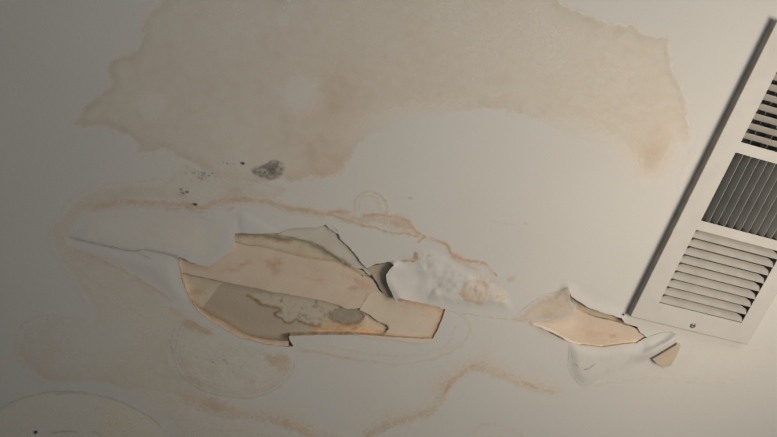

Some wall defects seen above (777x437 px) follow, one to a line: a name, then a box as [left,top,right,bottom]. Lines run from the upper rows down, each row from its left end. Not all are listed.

mould [253,161,283,179]
peeling [179,224,445,347]
peeling [511,288,681,367]